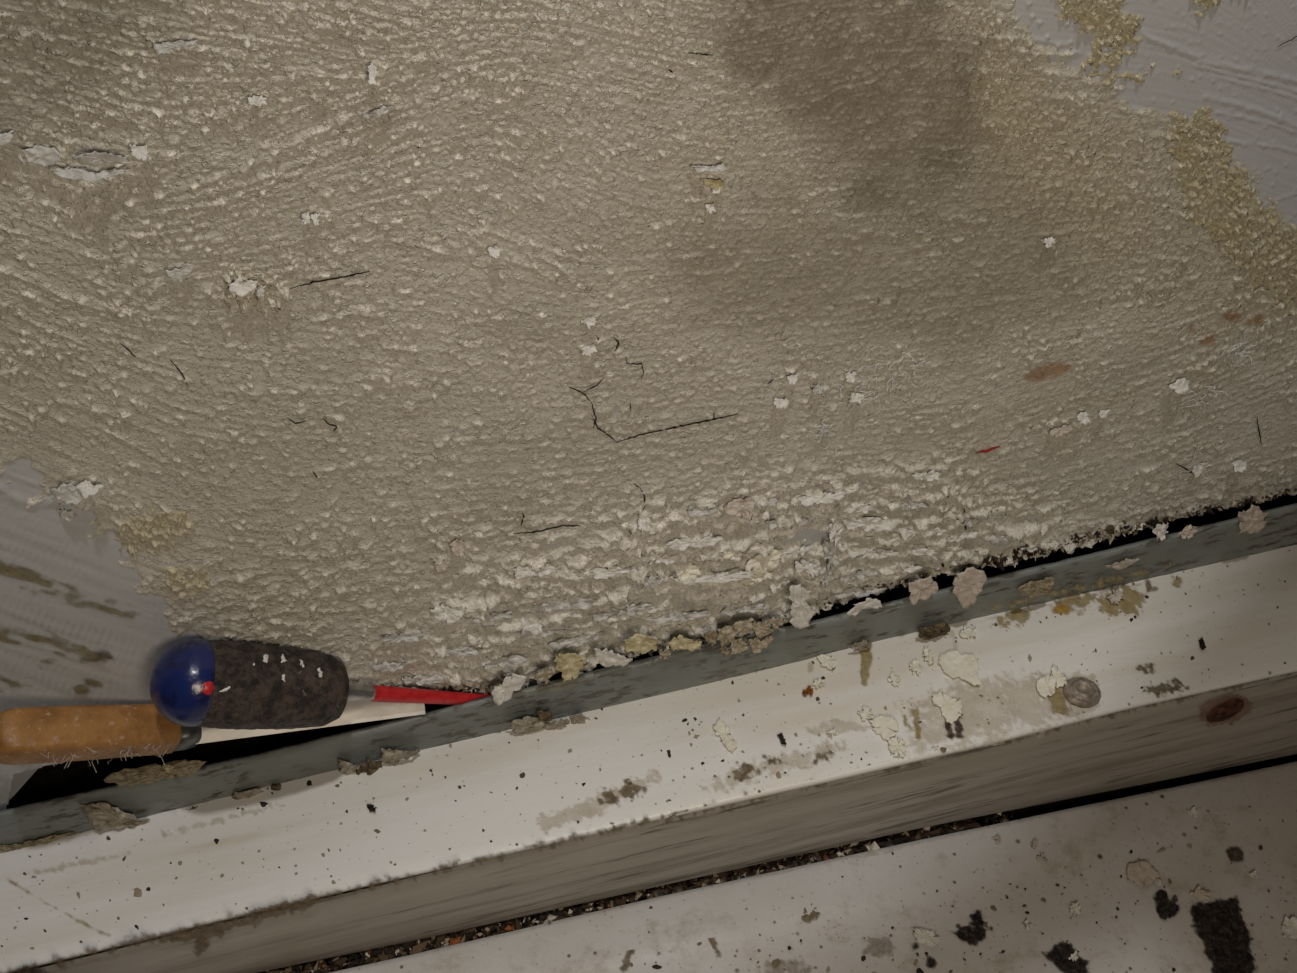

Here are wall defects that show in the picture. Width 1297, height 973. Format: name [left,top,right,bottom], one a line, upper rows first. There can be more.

peeling [1054,0,1156,88]
peeling [1162,106,1297,317]
crack [568,337,737,443]
peeling [50,479,104,522]
peeling [179,293,1297,712]
peeling [114,508,211,599]
peeling [932,689,965,724]
spalling [6,717,403,809]